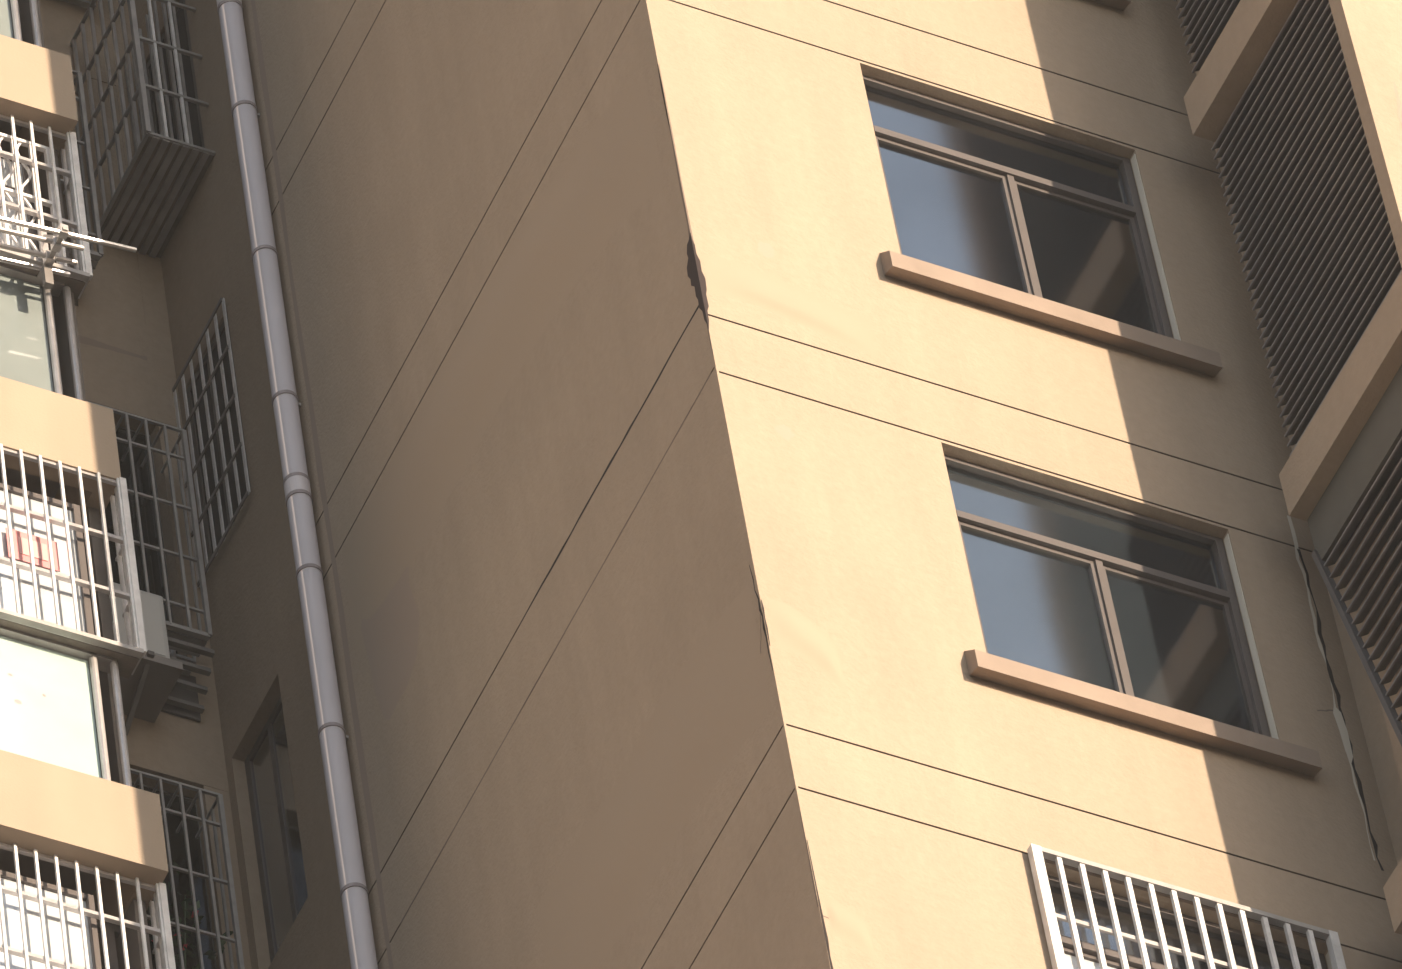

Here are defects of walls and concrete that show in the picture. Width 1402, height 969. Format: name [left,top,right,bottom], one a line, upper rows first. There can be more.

crack [657,64,694,242]
crack [1297,549,1384,871]